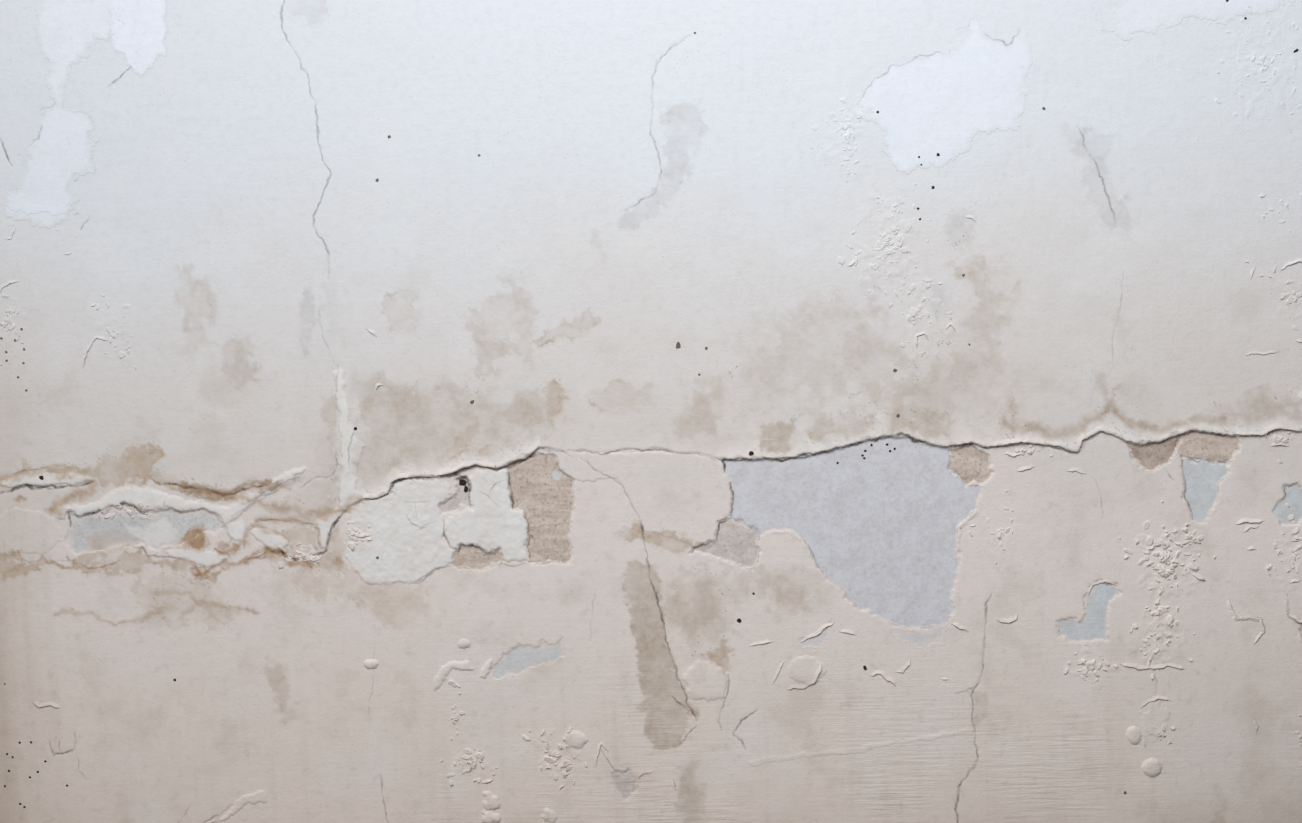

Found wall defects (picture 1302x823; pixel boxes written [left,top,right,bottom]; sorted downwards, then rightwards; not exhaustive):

crack [11,483,88,491]
spalling [66,499,225,556]
peeling [278,543,322,568]
damp [0,259,657,638]
damp [609,521,830,823]
spalling [340,414,1302,708]
damp [655,206,1302,464]